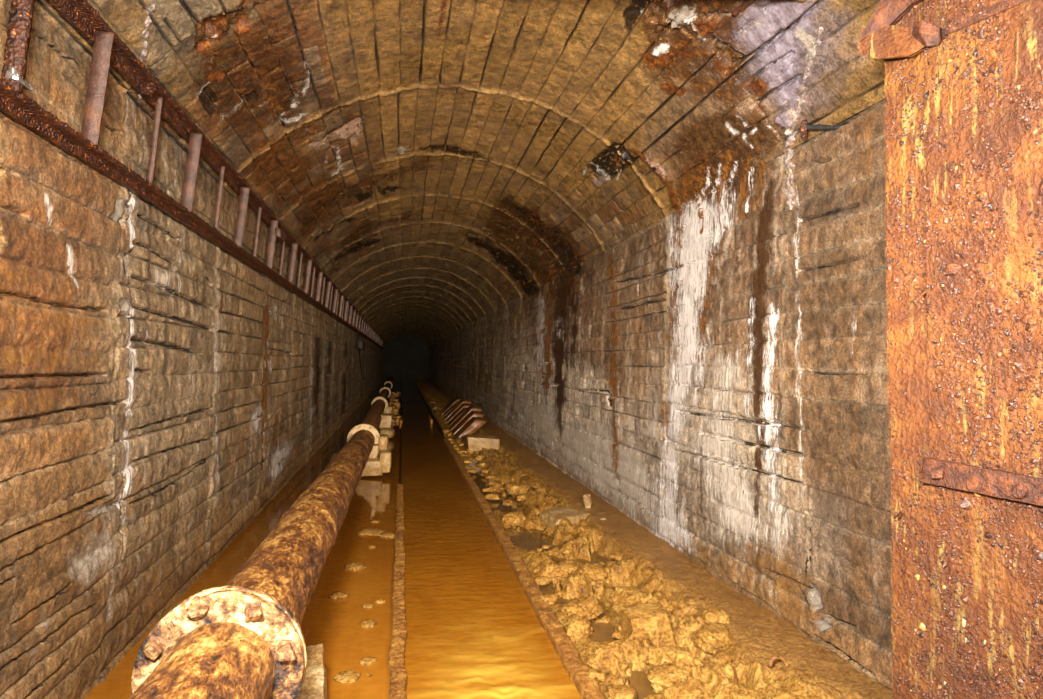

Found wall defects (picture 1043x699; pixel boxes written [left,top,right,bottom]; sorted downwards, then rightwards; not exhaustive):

spalling [195,0,276,49]
corrosion [192,14,490,239]
water stain [120,308,148,416]
water stain [151,255,184,292]
corrosion [261,290,278,458]
water stain [467,113,793,558]